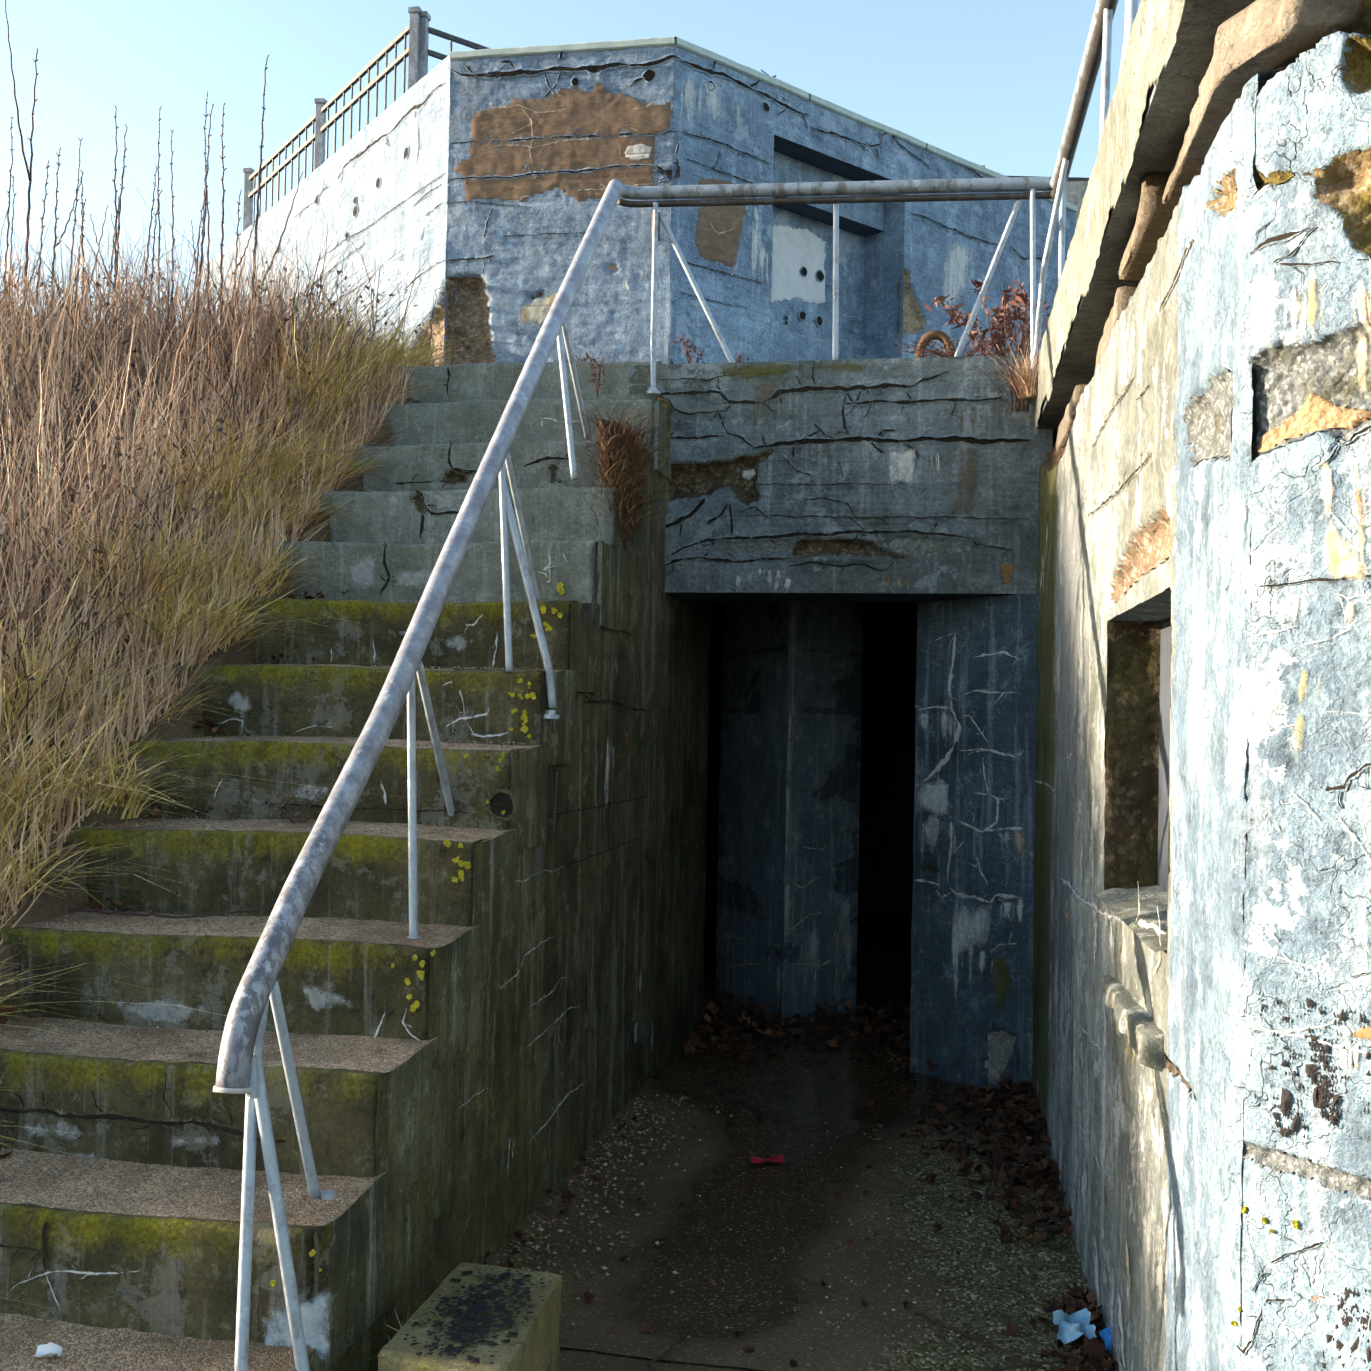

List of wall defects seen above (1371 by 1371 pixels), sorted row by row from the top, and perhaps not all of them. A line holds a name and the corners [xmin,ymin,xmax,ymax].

spalling [1331,29,1371,93]
peeling [454,83,680,202]
spalling [1254,147,1371,255]
crack [655,363,1030,574]
spalling [1182,368,1234,469]
spalling [1248,320,1371,461]
spalling [1109,507,1173,609]
crack [1243,572,1371,654]
crack [915,631,1055,951]
crack [1273,762,1371,862]
crack [1061,867,1163,974]
crack [1237,1241,1322,1355]